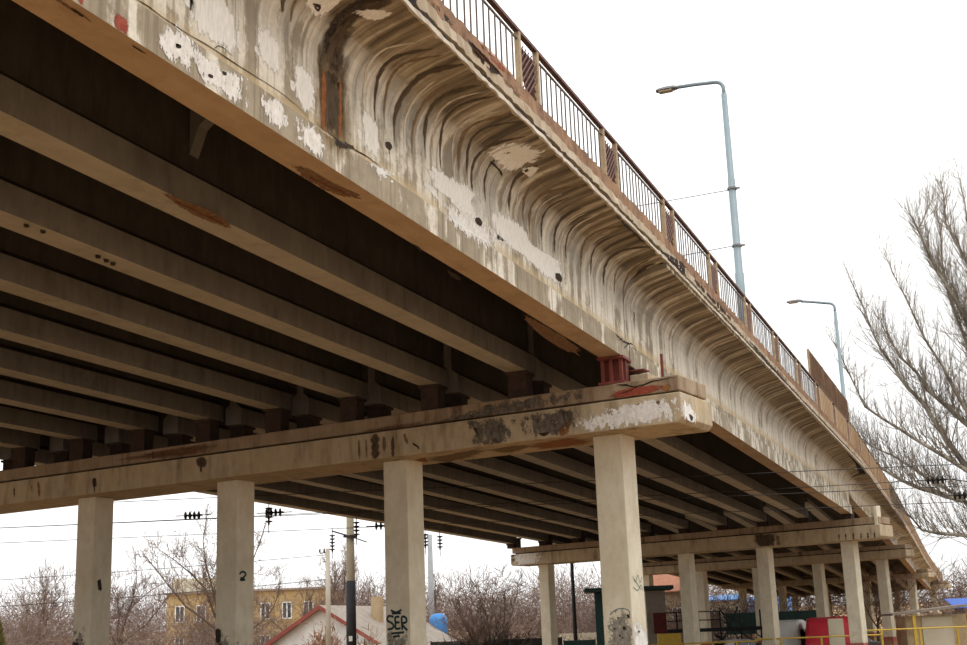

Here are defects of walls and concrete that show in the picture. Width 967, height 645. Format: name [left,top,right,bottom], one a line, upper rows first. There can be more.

peeling [306,0,342,18]
peeling [351,9,392,21]
peeling [159,0,248,108]
peeling [255,27,279,73]
water stain [318,0,390,140]
peeling [261,61,395,183]
corrosion [319,70,348,152]
spalling [292,165,360,199]
corrosion [612,385,670,398]
peeling [464,392,701,445]
peeling [215,628,238,645]
peeling [603,609,648,645]